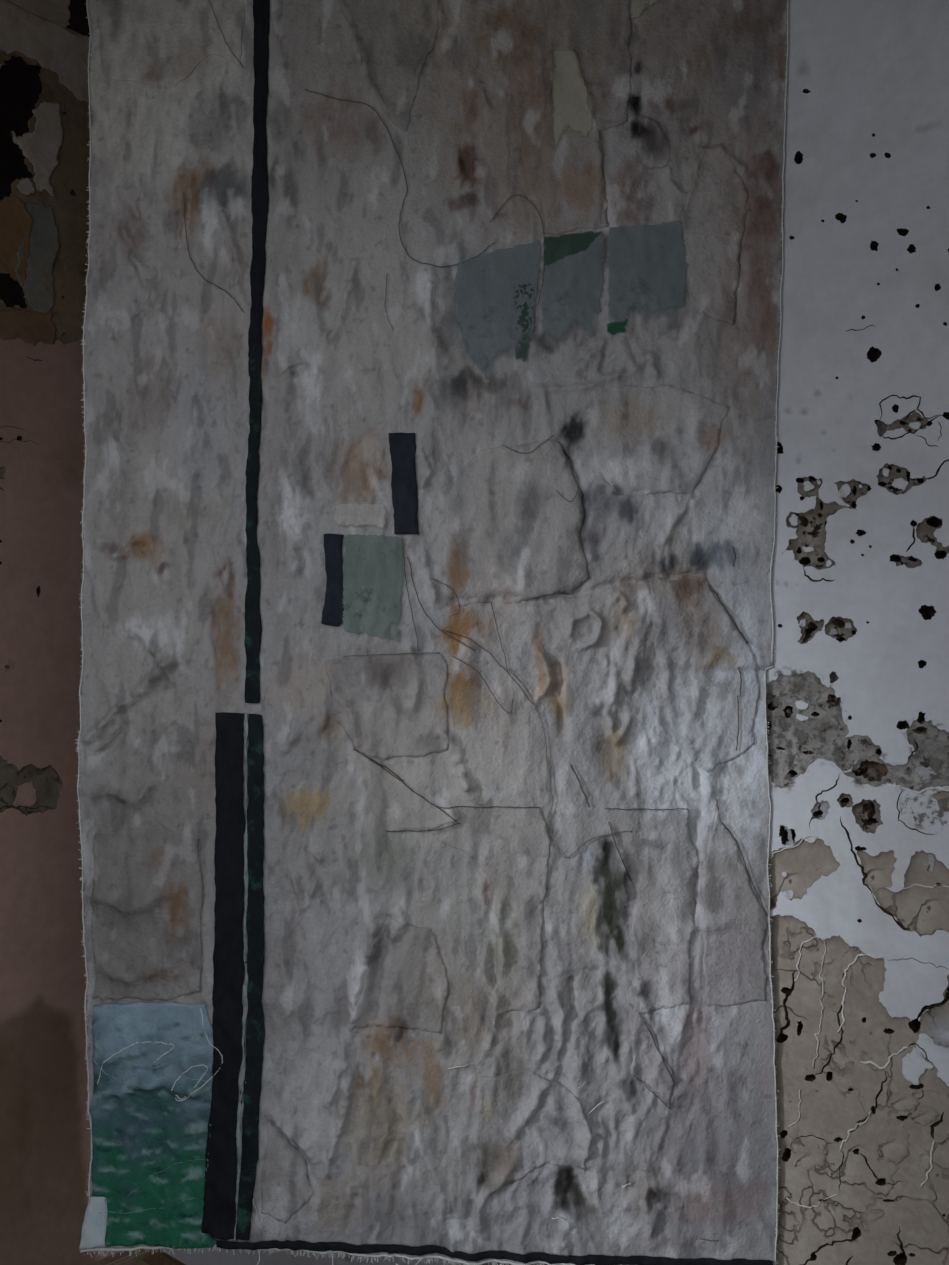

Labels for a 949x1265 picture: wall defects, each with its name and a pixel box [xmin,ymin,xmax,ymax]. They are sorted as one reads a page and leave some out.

peeling [0,0,91,344]
spalling [797,611,858,644]
spalling [782,459,949,582]
spalling [874,395,949,447]
spalling [0,756,63,816]
spalling [766,671,949,937]
spalling [768,825,949,1265]
crack [809,774,949,1071]